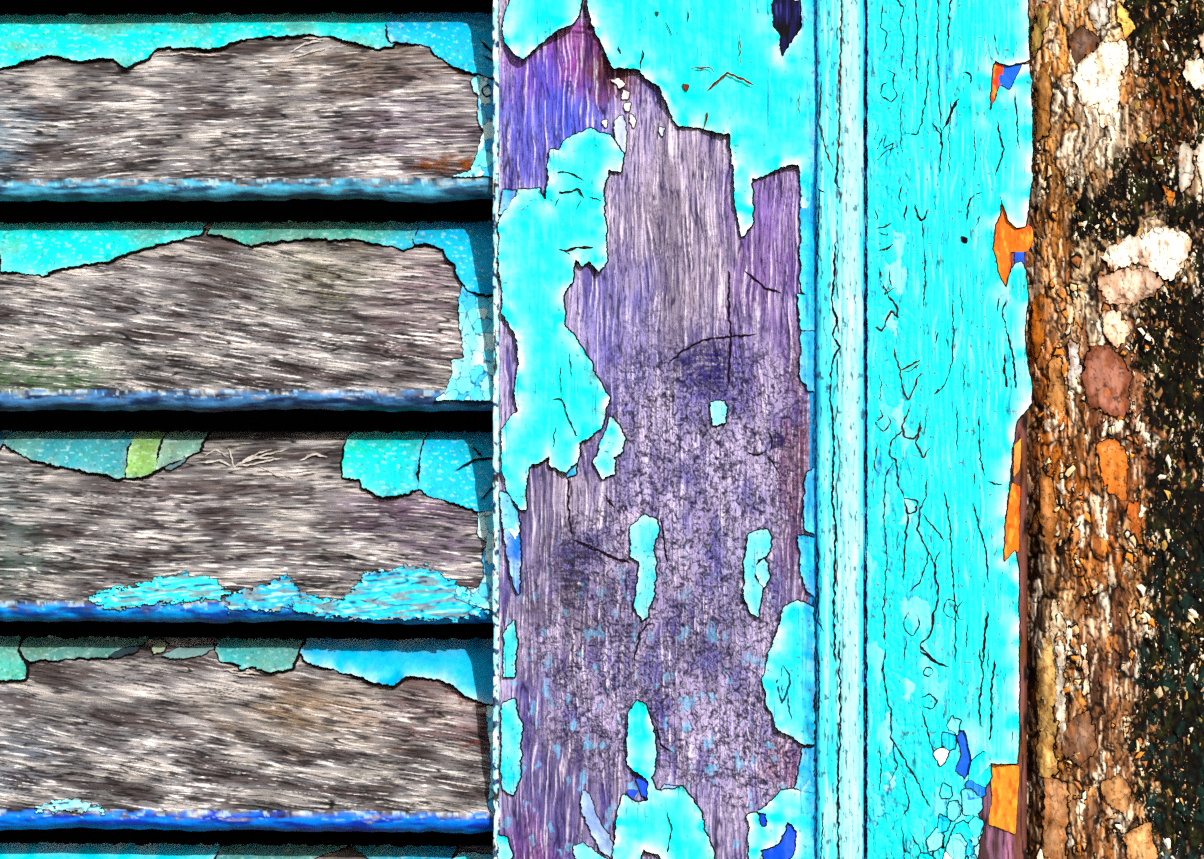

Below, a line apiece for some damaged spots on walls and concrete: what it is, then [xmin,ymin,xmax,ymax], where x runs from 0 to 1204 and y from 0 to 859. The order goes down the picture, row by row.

crack [691,30,756,128]
crack [670,270,781,386]
peeling [0,0,817,859]
crack [776,0,1020,859]
peeling [933,715,962,767]
peeling [918,751,993,859]